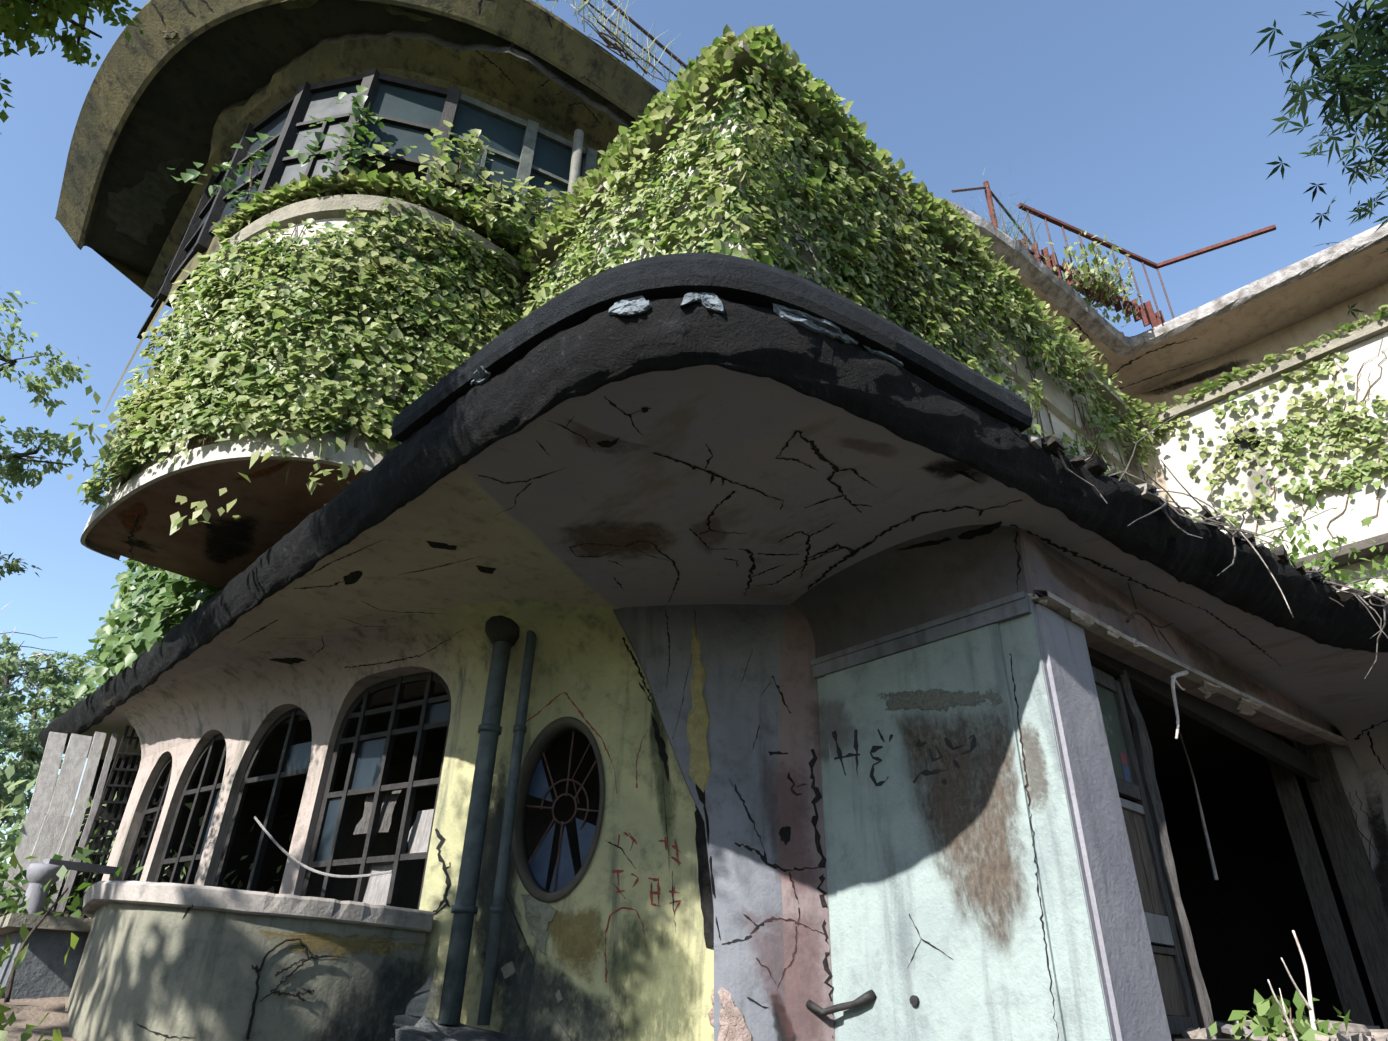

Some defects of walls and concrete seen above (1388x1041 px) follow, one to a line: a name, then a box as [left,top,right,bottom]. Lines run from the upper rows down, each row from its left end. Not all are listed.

crack [479,417,595,515]
leakage [205,517,254,563]
crack [294,539,464,668]
crack [569,396,1281,739]
spalling [651,713,669,780]
leakage [650,694,673,835]
peeling [686,624,721,948]
spalling [779,826,791,845]
leakage [881,689,1021,942]
leakage [476,764,696,1041]
spalling [708,987,753,1041]